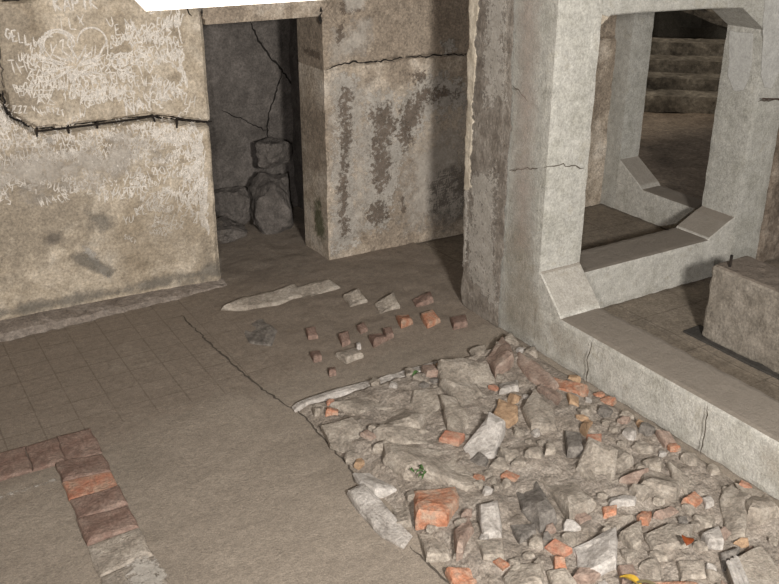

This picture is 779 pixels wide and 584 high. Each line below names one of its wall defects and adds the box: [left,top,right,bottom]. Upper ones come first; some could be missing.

crack [0,22,291,137]
crack [326,53,465,70]
leakage [403,118,465,232]
crack [700,406,708,454]